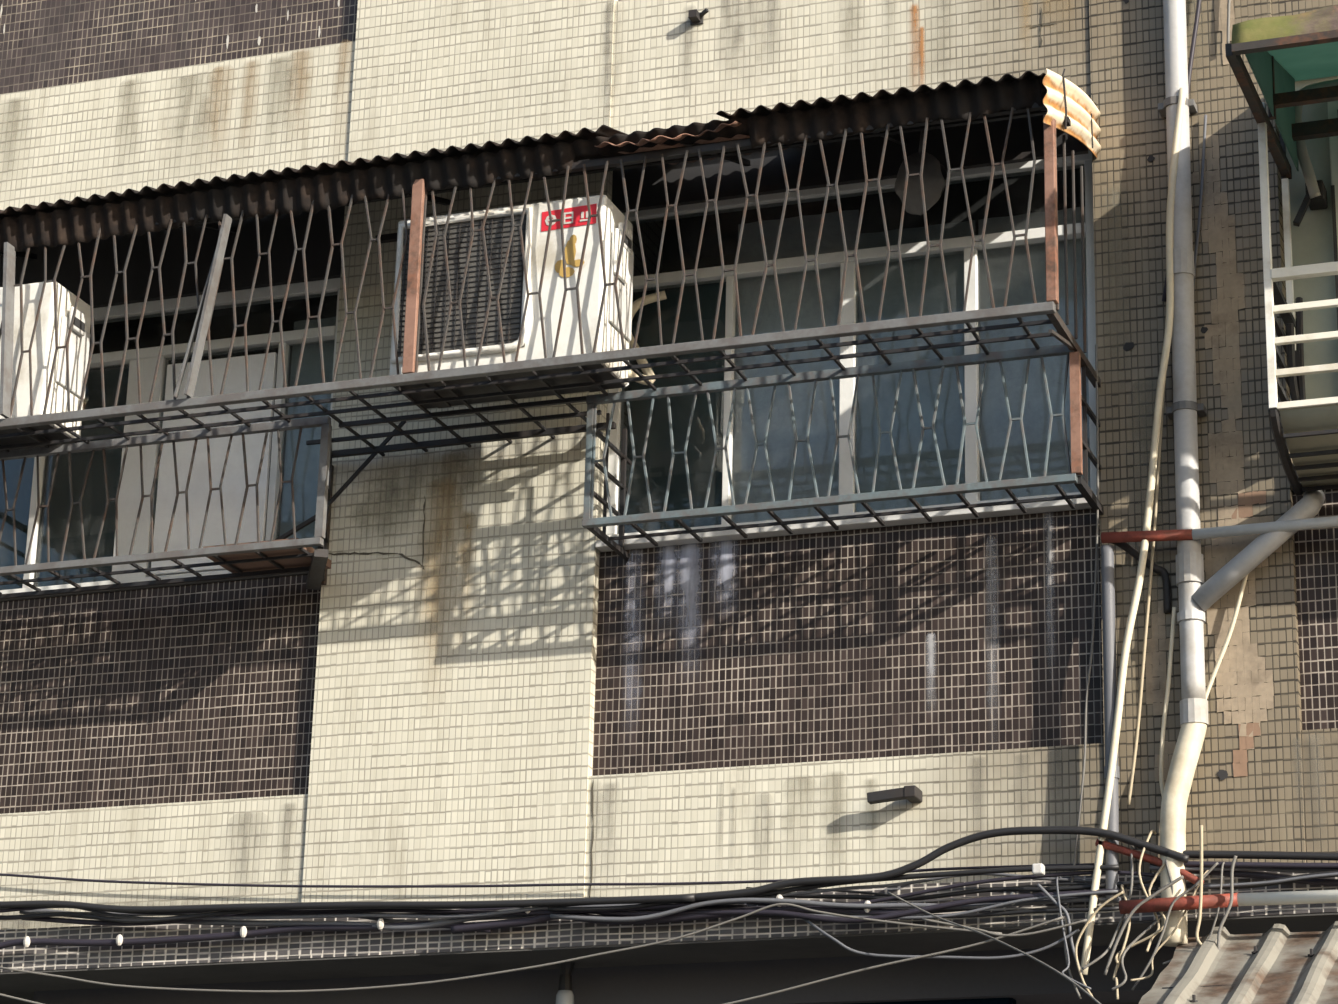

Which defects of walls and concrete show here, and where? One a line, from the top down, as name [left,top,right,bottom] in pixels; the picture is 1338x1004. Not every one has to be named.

corrosion [913,6,924,74]
crack [328,496,426,570]
damp [664,543,699,618]
damp [721,540,732,584]
spalling [1207,545,1282,780]